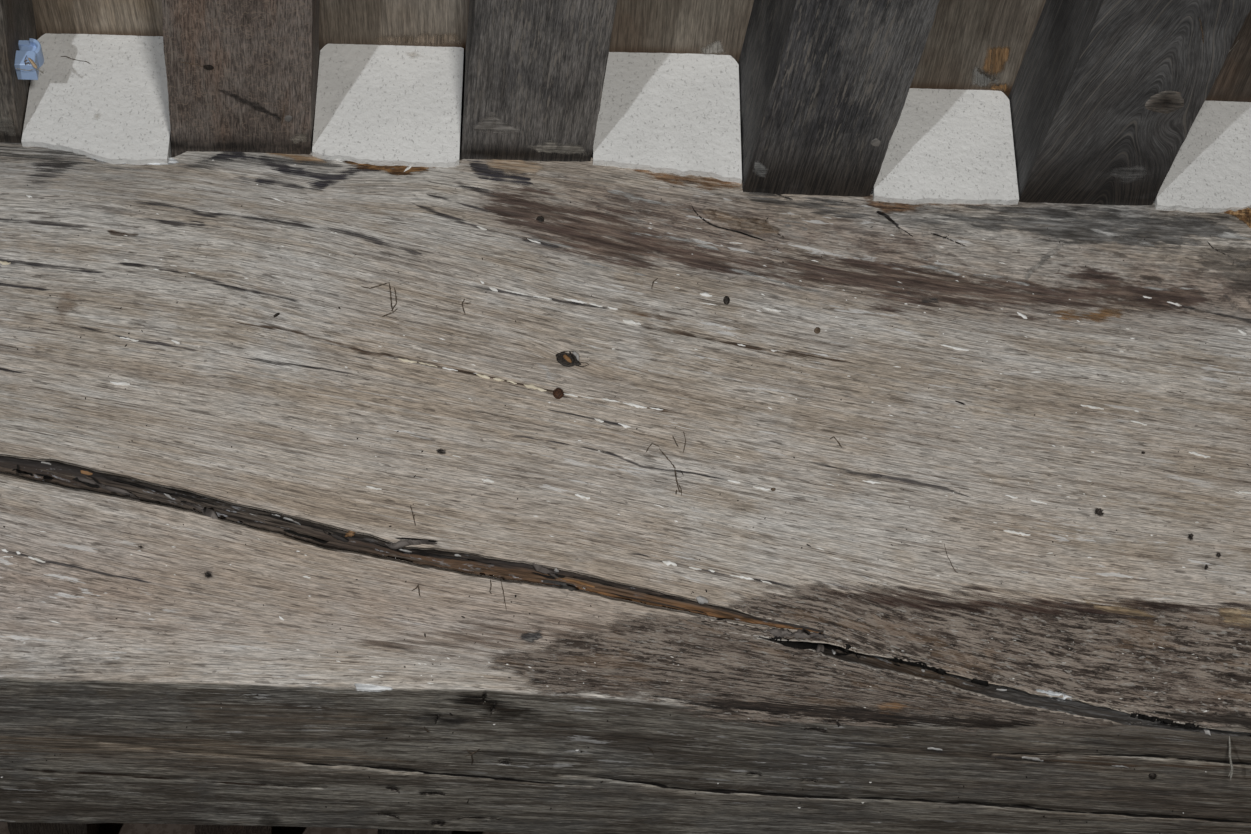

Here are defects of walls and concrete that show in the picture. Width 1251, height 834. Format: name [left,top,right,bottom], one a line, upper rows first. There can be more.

leakage [484,159,1235,322]
crack [0,456,1251,768]
leakage [834,586,1249,616]
leakage [367,615,615,661]
leakage [651,695,1036,729]
leakage [1151,711,1251,730]